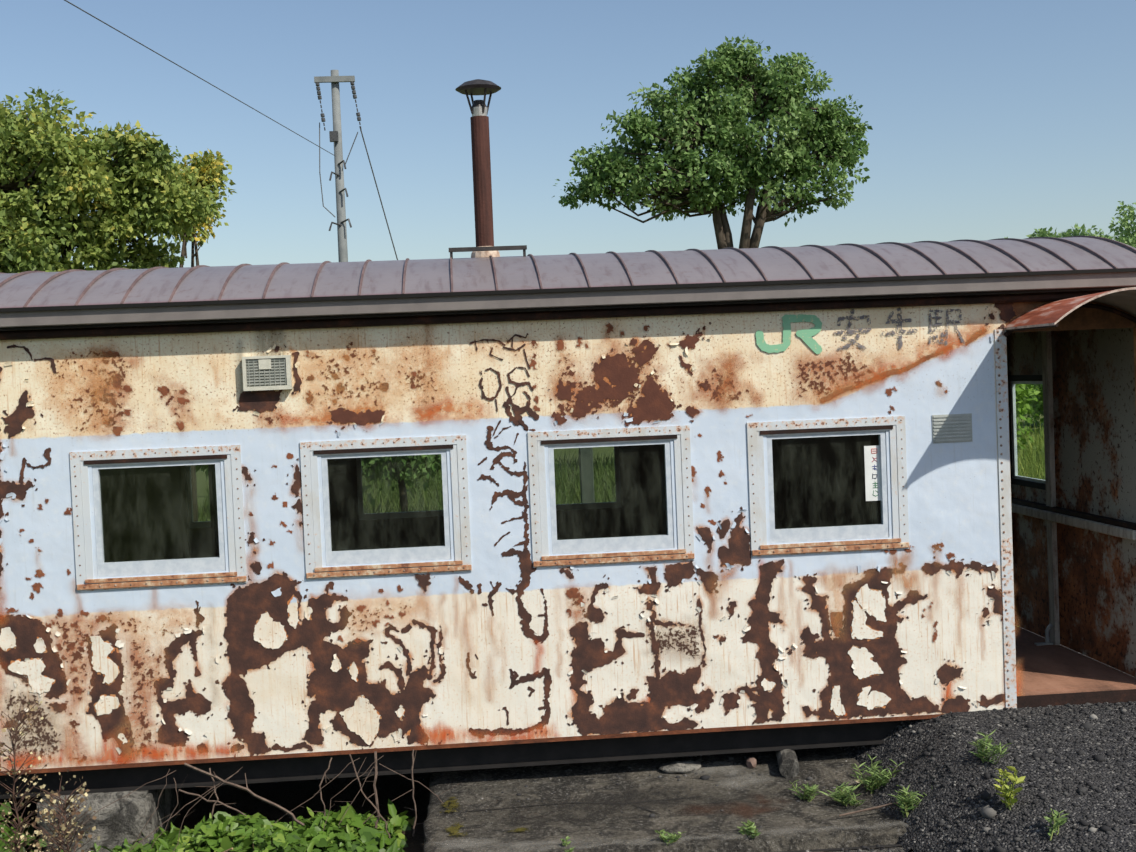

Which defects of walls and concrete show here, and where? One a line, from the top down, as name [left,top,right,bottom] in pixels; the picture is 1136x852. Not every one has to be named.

rust [51,349,132,436]
peeling [233,344,304,416]
peeling [326,406,385,437]
rust [477,338,538,369]
rust [533,323,680,426]
rust [797,326,987,414]
peeling [0,379,43,576]
peeling [286,458,306,526]
rust [26,570,45,599]
peeling [154,532,446,757]
peeling [565,506,1006,736]
peeling [0,614,141,764]